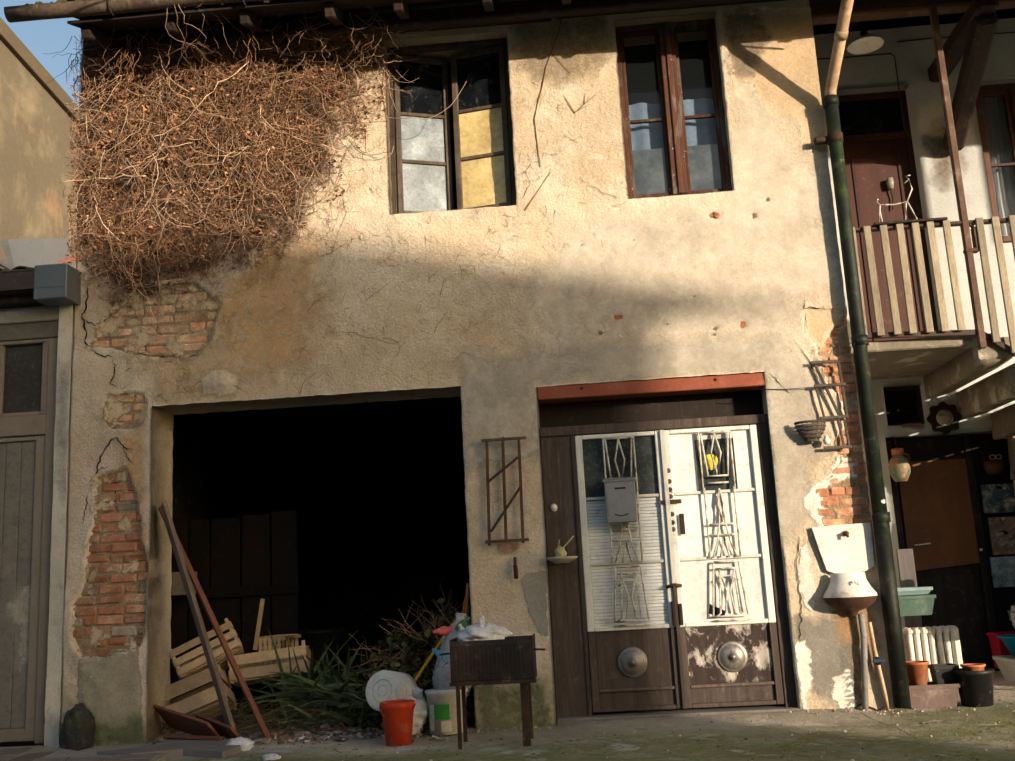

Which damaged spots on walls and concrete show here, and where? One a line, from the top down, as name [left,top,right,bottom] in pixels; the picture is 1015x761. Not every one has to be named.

leakage [727,12,771,75]
crack [81,288,199,388]
flaking render [86,278,221,359]
flaking render [103,393,148,429]
crack [82,437,134,522]
flaking render [797,305,871,611]
flaking render [72,462,147,658]
peeling [795,641,813,710]
peeling [831,669,857,709]